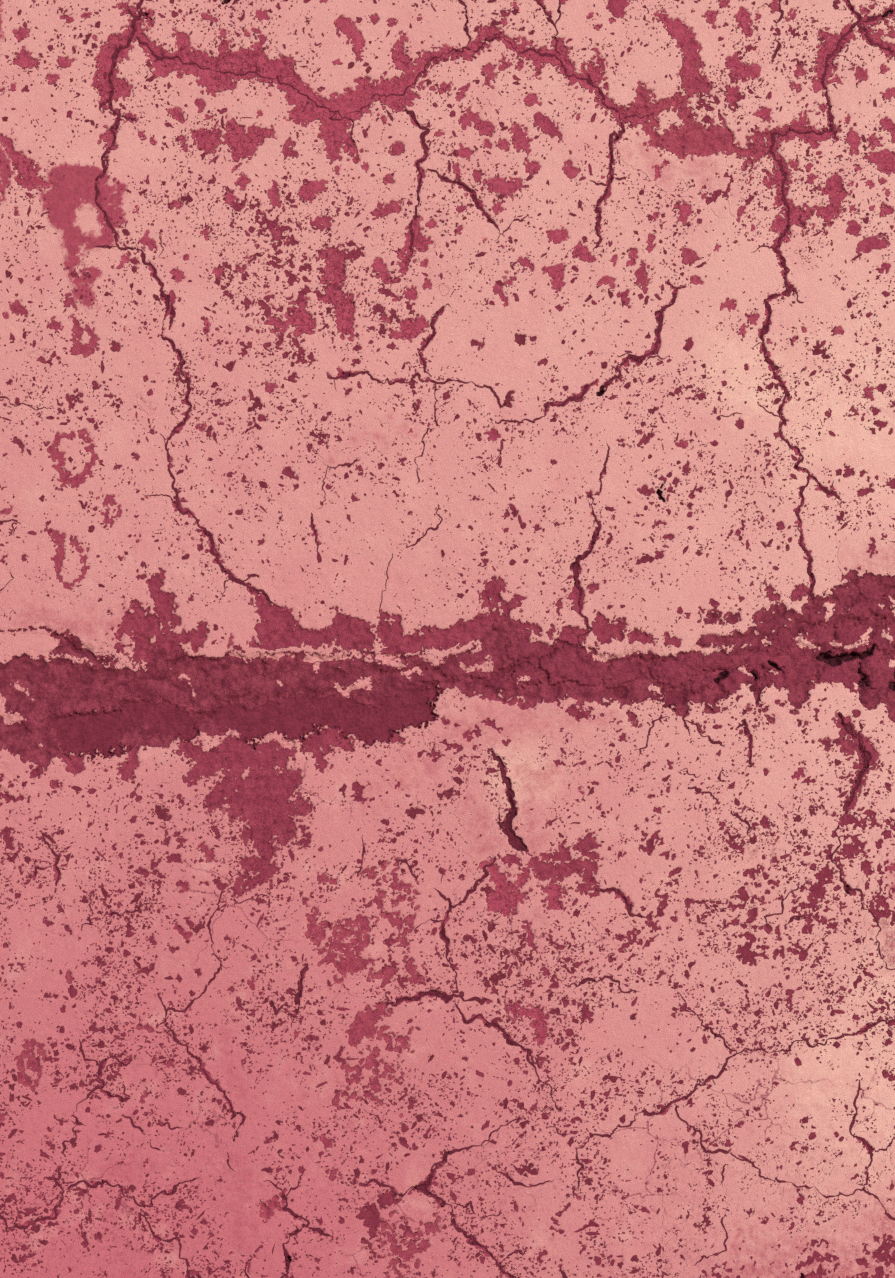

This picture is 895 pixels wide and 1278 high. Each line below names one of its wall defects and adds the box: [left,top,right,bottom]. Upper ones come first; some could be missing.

peeling [0,129,132,357]
crack [95,0,687,615]
peeling [89,0,895,371]
crack [718,0,894,601]
crack [561,441,610,649]
flaking render [0,534,895,978]
crack [639,674,763,838]
peeling [297,849,431,1119]
peeling [478,829,604,1046]
crack [366,748,895,1278]
crack [0,1039,201,1278]
peeling [782,1221,895,1278]